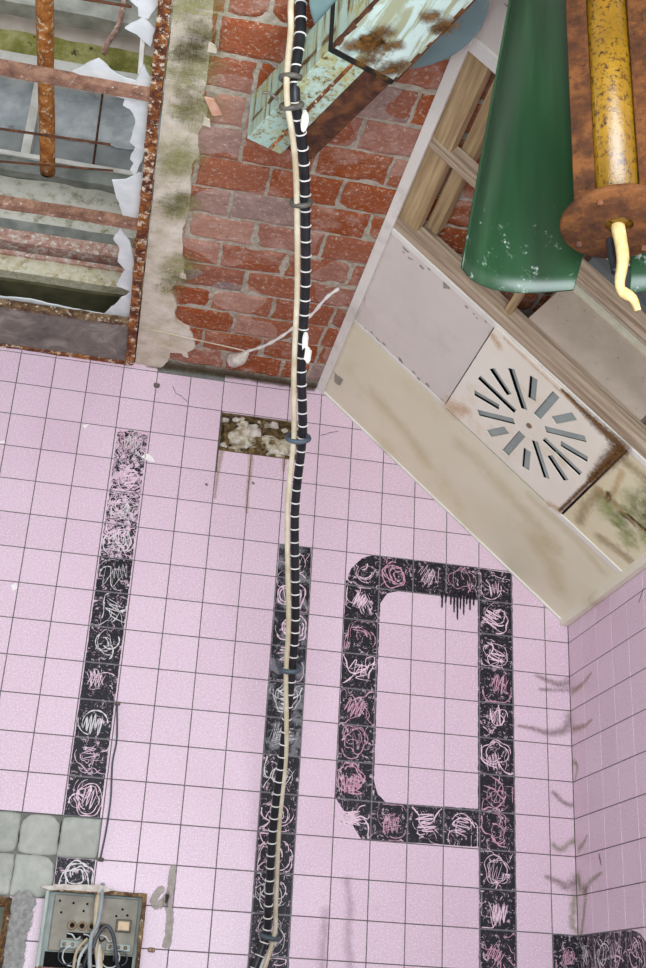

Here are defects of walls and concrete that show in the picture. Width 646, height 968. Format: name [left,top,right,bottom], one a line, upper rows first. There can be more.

flaking render [135,0,222,368]